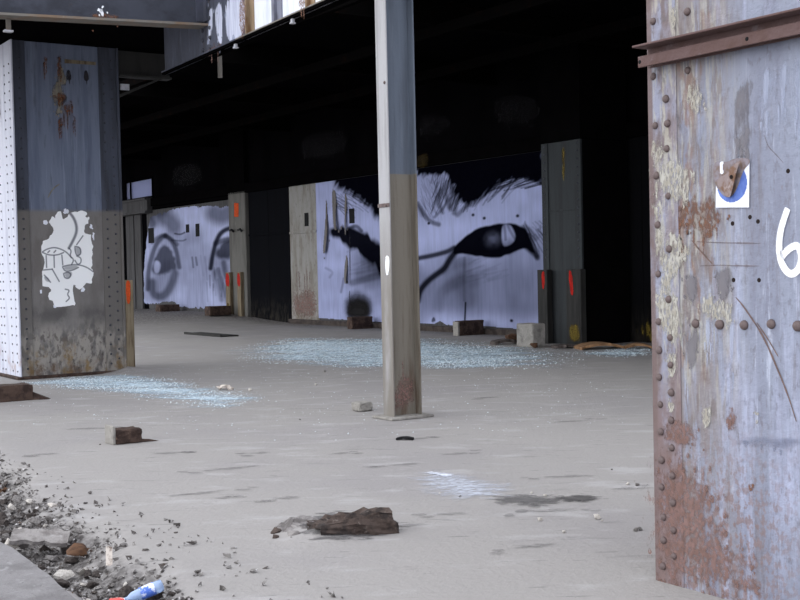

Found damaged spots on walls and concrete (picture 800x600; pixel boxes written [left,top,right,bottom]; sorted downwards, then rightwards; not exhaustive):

peeling [649,140,735,380]
rust [678,195,730,262]
rust [645,420,760,599]